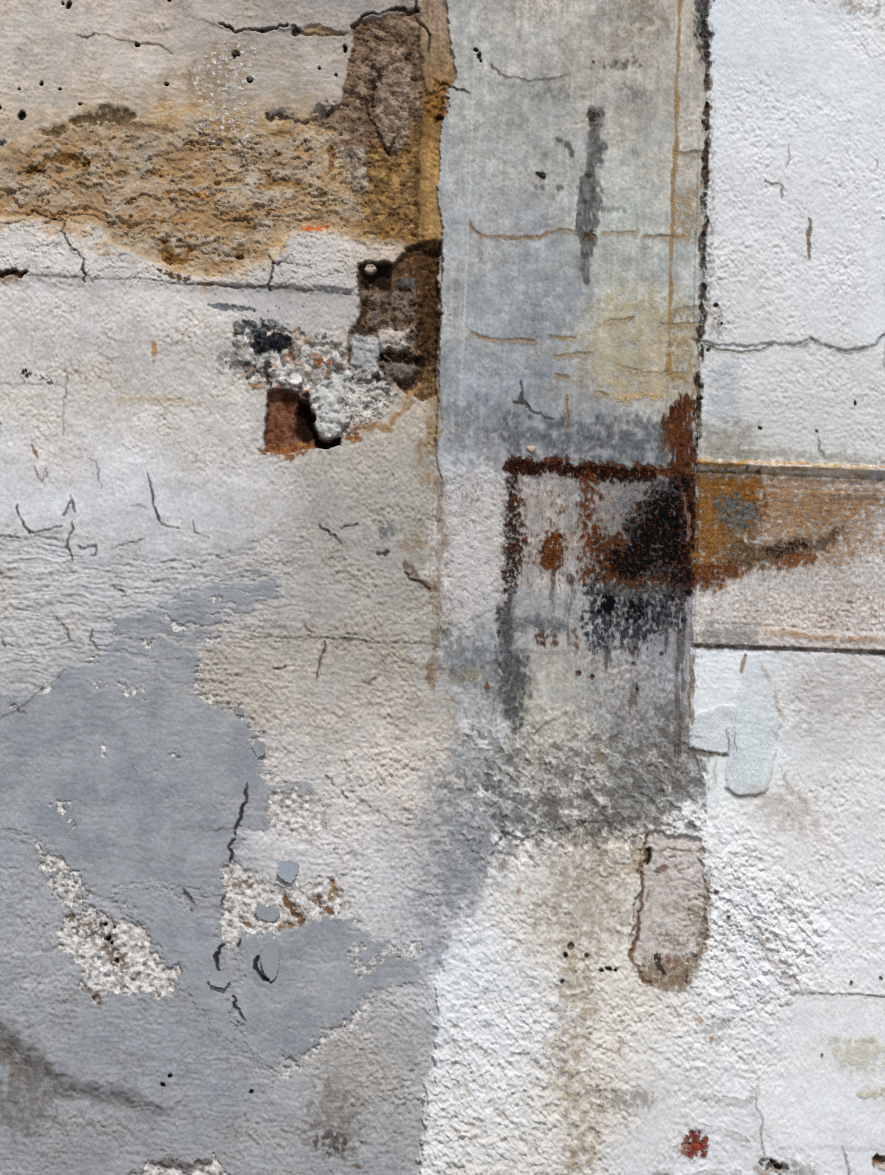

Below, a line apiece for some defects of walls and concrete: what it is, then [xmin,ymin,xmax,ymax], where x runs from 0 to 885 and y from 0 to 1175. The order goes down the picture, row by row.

crack [220,23,301,36]
crack [0,210,109,282]
flaking render [0,12,449,461]
water stain [535,106,626,285]
rust [495,0,885,757]
crack [1,499,97,559]
water stain [497,594,573,645]
peeling [688,666,783,798]
flaking render [34,841,182,1006]
crack [213,939,272,982]
peeling [216,859,351,981]
flaking render [628,831,712,991]